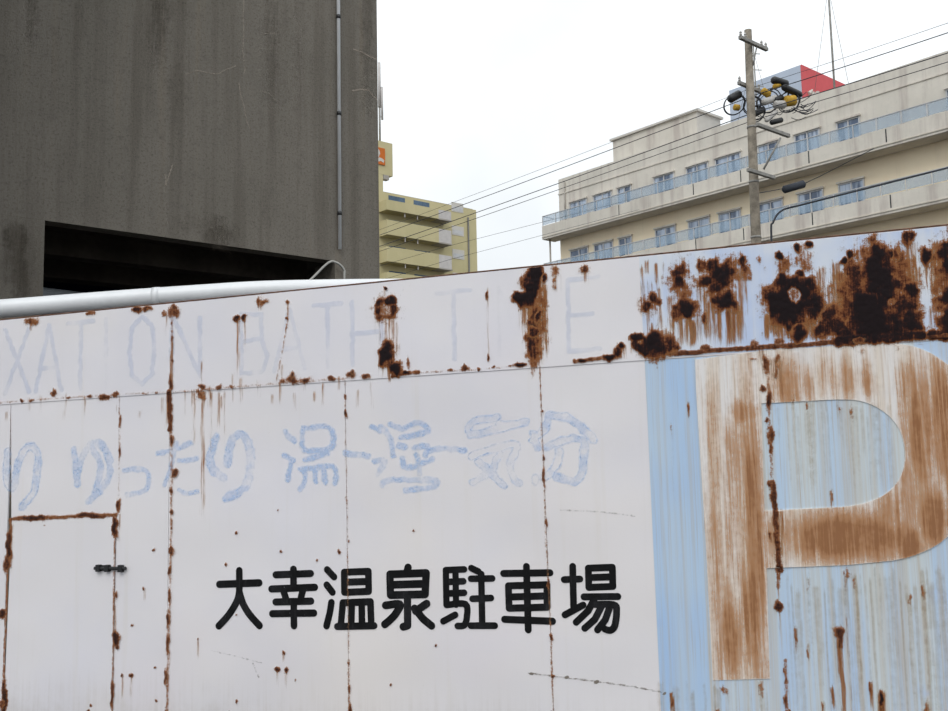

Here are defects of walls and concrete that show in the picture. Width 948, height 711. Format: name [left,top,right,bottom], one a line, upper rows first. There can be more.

corrosion [232,314,247,355]
corrosion [365,286,420,380]
corrosion [573,226,948,419]
corrosion [194,389,220,417]
corrosion [707,355,948,697]
corrosion [0,512,133,711]
corrosion [821,620,852,711]